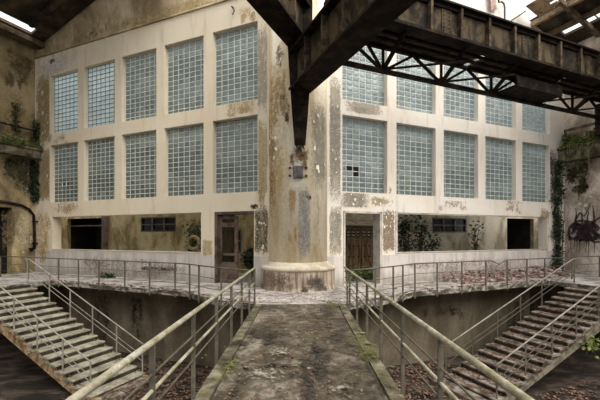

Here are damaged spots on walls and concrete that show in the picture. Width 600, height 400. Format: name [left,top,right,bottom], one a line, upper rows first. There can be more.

peeling [251,120,278,255]
damp [261,272,294,292]
damp [269,75,290,206]
damp [288,187,310,260]
damp [301,275,327,293]
peeling [311,80,395,256]